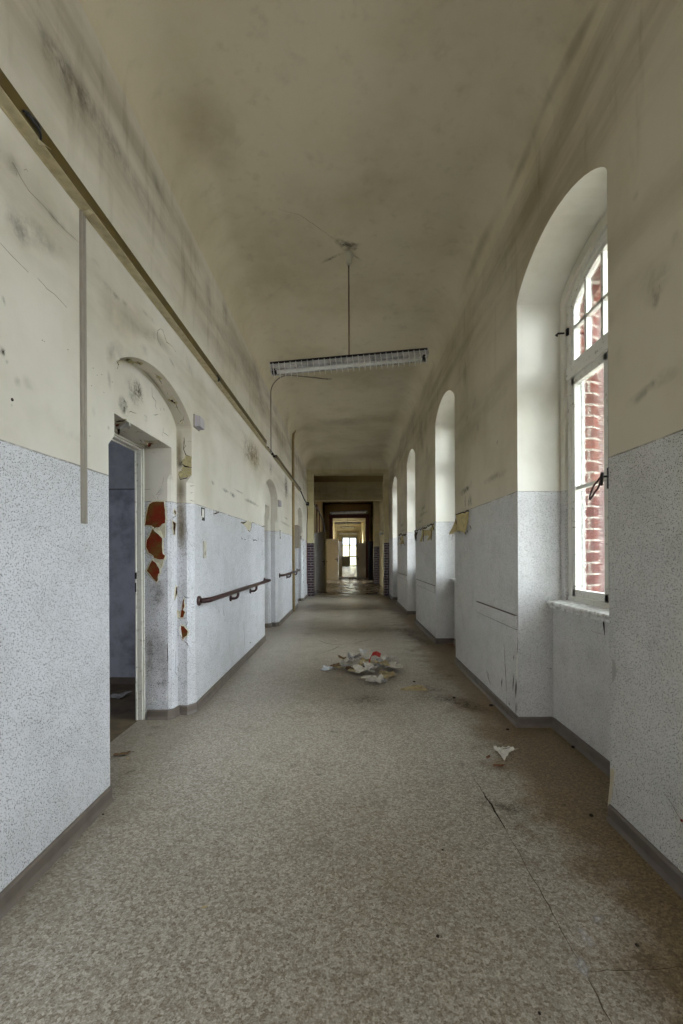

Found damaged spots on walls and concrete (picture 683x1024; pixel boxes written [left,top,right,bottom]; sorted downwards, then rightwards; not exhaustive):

peeling [178,439,192,480]
spalling [144,478,177,584]
spalling [174,585,189,645]
crack [474,779,683,1024]